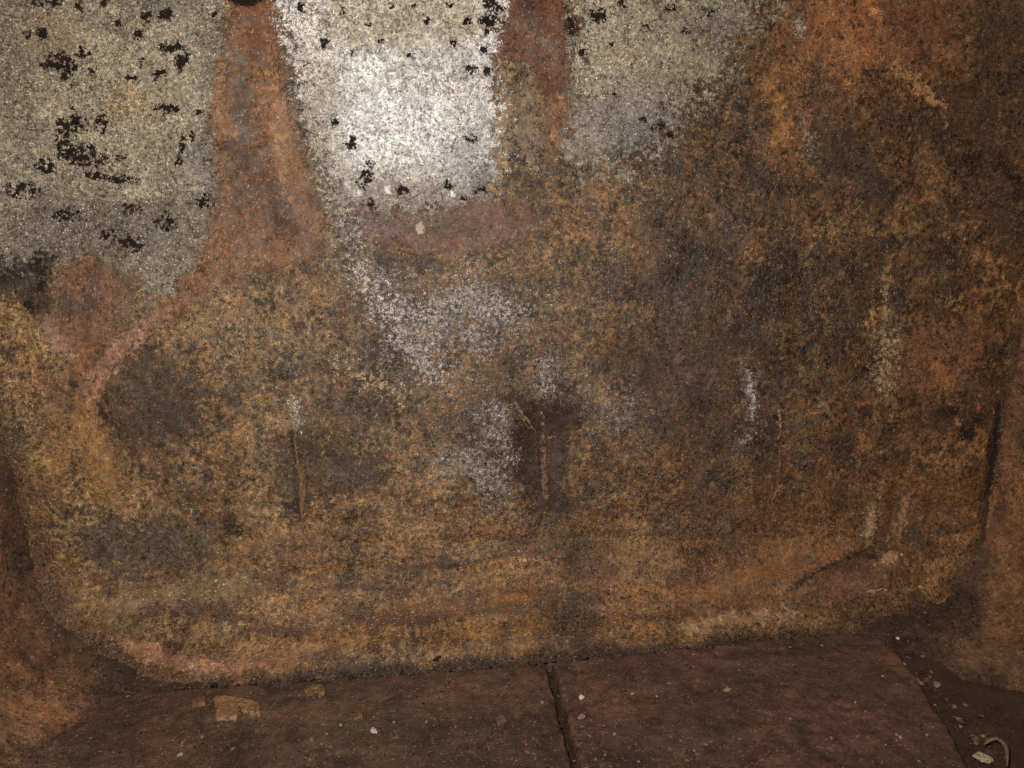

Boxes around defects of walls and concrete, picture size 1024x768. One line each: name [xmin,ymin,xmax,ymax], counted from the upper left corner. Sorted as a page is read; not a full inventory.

damp [166,291,281,353]
corrosion [24,0,575,525]
damp [280,78,770,529]
corrosion [852,304,1010,426]
corrosion [659,510,885,643]